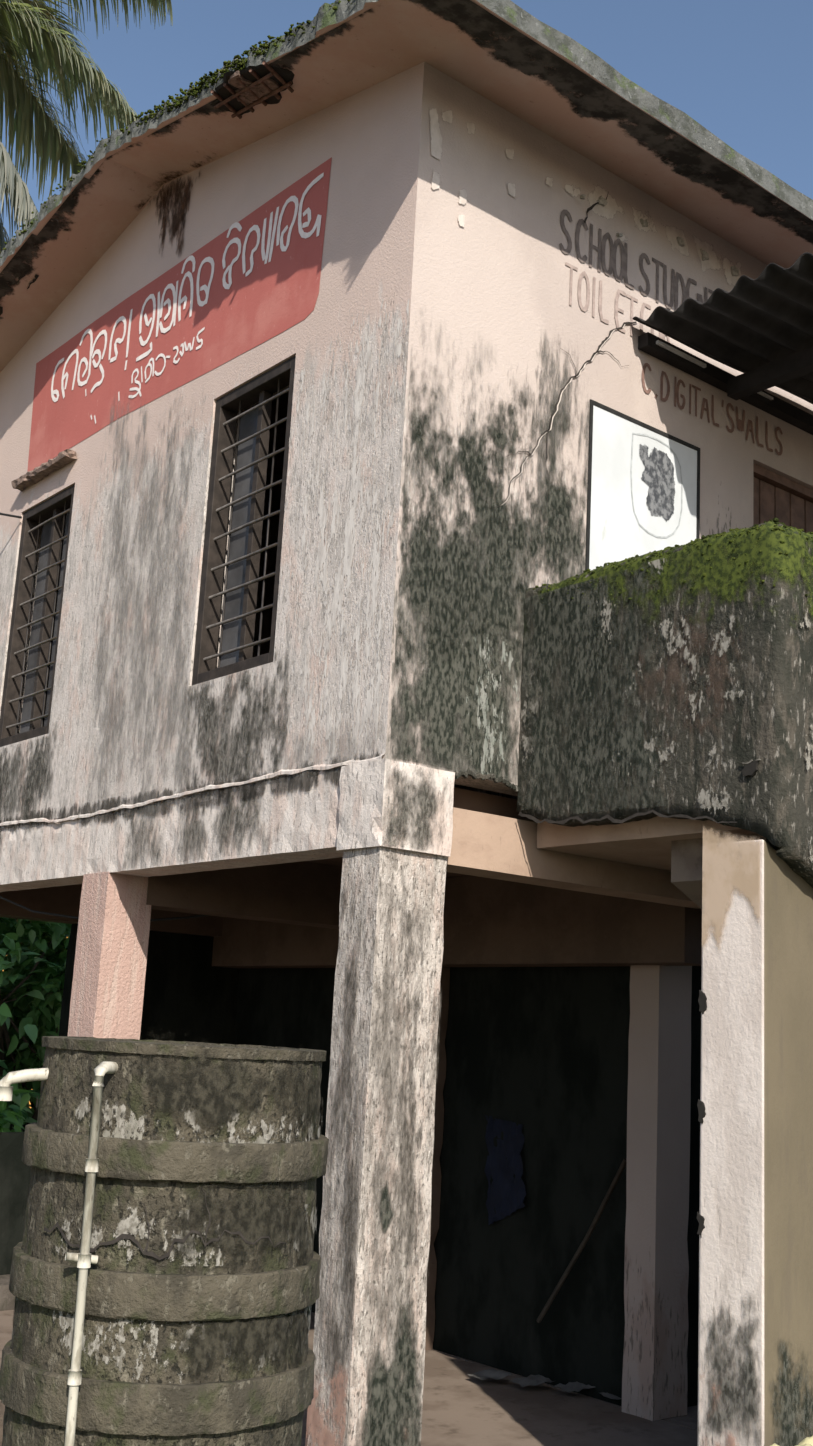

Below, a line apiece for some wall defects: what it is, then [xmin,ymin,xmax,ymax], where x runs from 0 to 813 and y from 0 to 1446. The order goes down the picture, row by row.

spalling [210,61,294,119]
damp [0,99,226,300]
crack [584,194,608,223]
crack [497,321,638,507]
damp [385,341,666,847]
peeling [657,615,744,722]
damp [182,656,288,861]
peeling [644,736,679,787]
peeling [698,742,731,814]
peeling [805,724,813,771]
damp [362,962,422,1446]
damp [707,1312,813,1446]